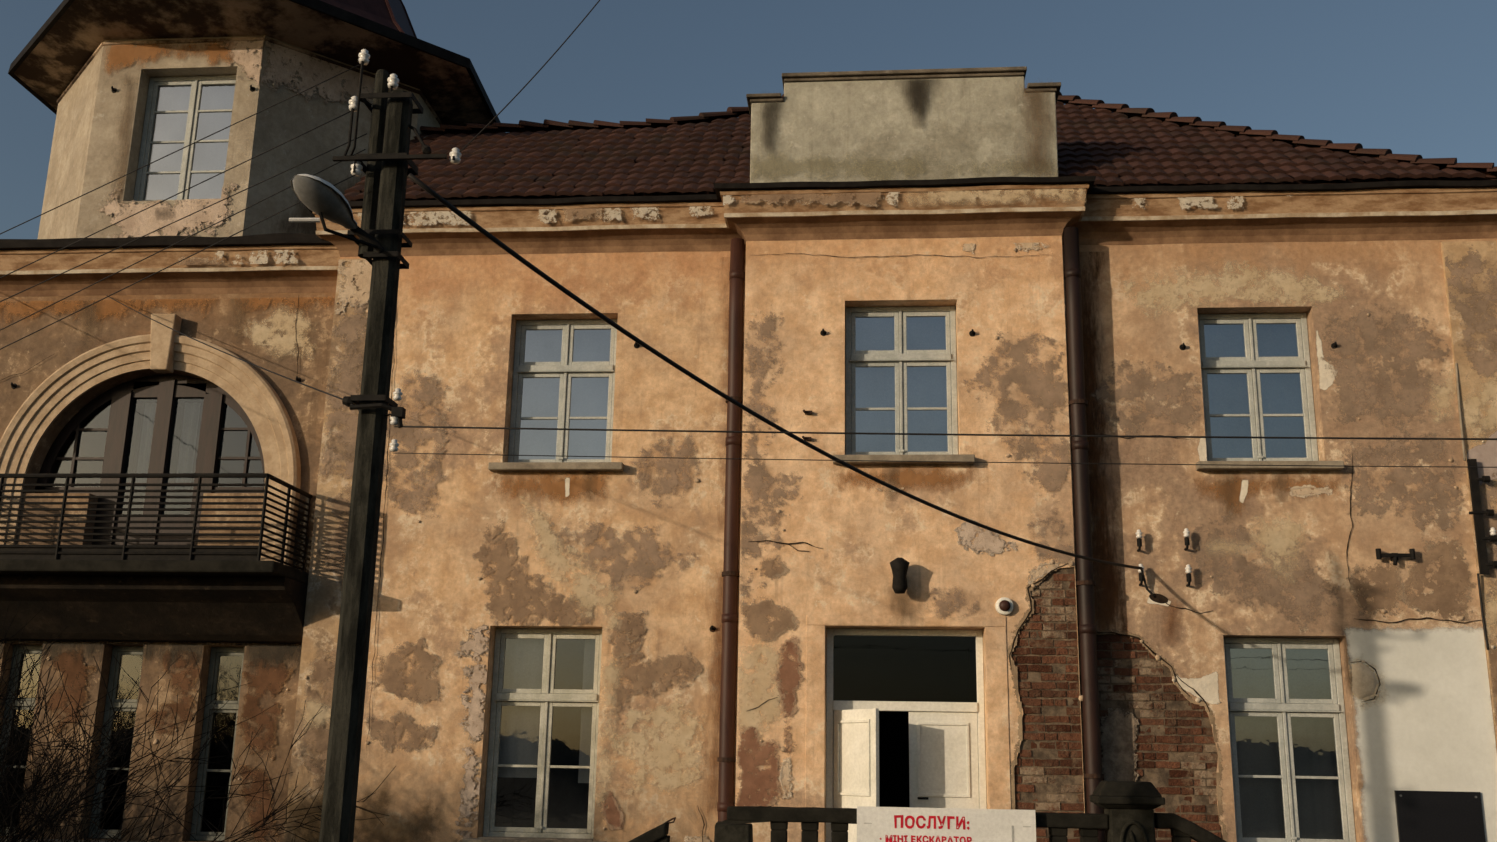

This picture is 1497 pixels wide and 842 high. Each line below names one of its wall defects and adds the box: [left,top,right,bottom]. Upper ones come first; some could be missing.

water stain [105,42,230,73]
flaking render [97,182,298,264]
peeling [403,211,471,226]
peeling [537,207,659,224]
peeling [1177,196,1244,210]
flaking render [963,333,1071,492]
flaking render [1092,360,1207,461]
flaking render [1189,245,1497,722]
flaking render [954,519,1017,557]
crack [1346,453,1480,623]
flaking render [363,520,703,842]
spalling [1007,512,1228,842]